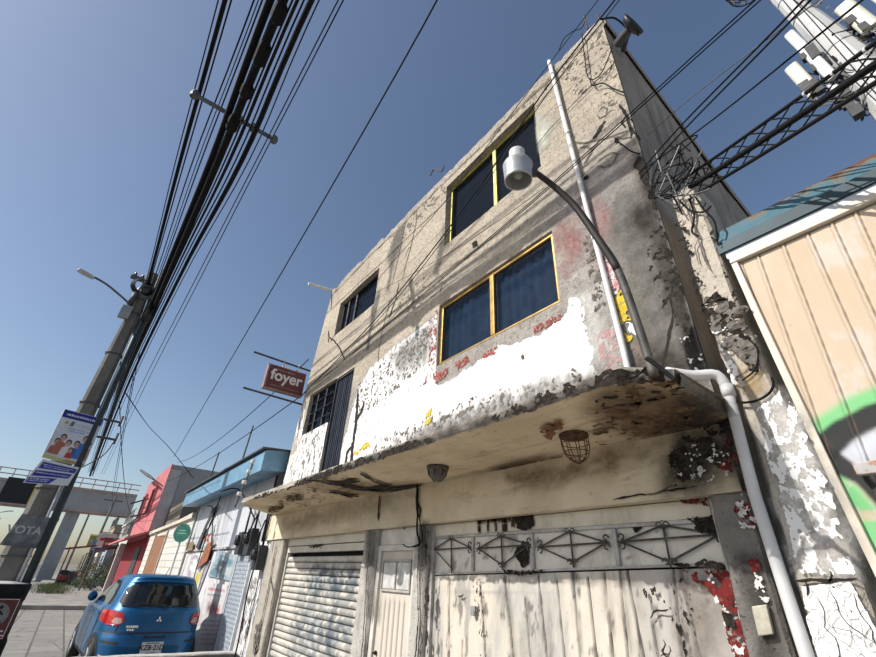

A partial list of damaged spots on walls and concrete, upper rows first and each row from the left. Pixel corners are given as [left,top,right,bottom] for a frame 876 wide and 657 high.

spalling [633,156,761,387]
peeling [254,236,738,513]
leakage [591,388,745,493]
peeling [734,492,757,530]
peeling [757,391,876,657]
peeling [671,563,749,657]
peeling [748,559,770,603]
crack [795,571,876,657]